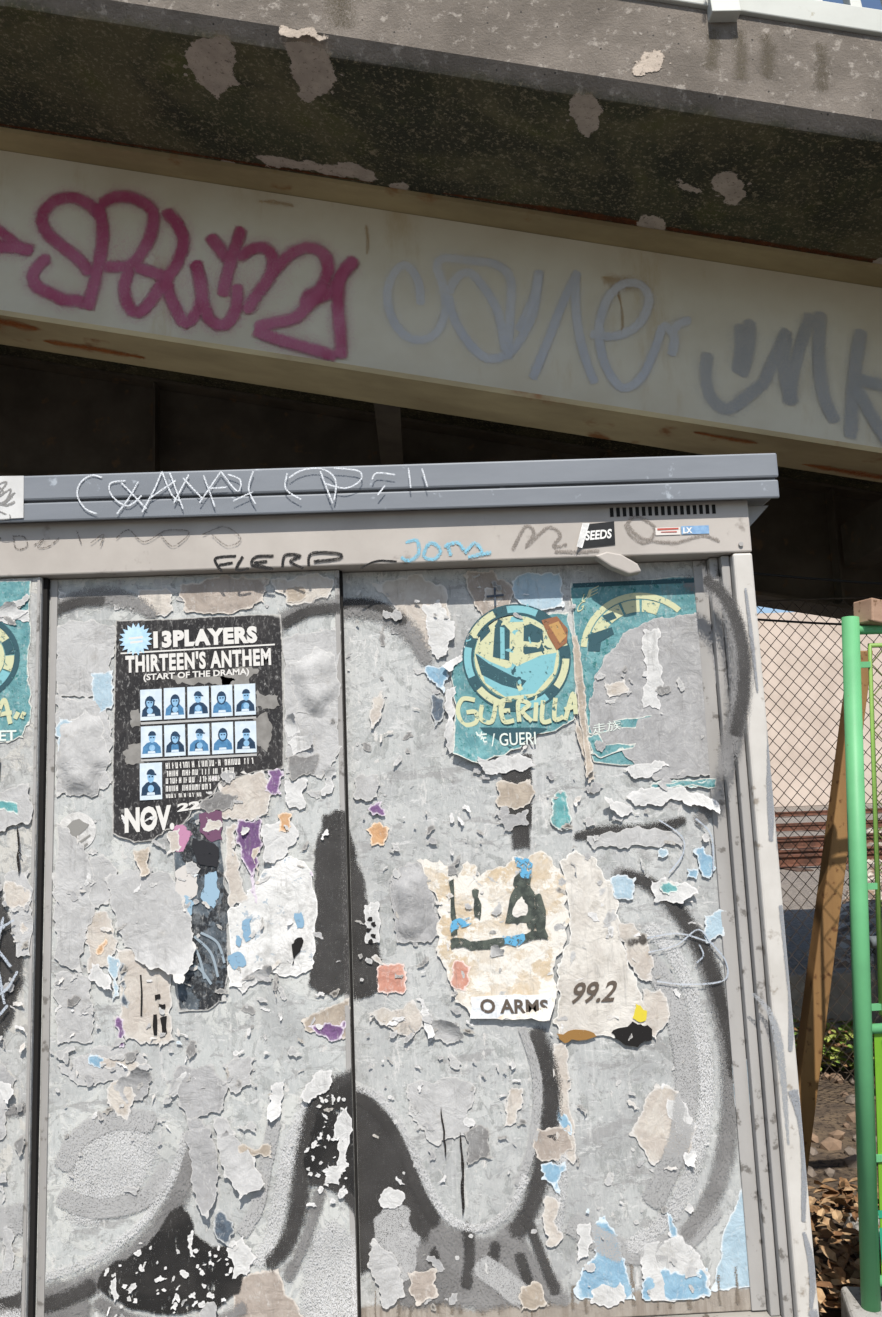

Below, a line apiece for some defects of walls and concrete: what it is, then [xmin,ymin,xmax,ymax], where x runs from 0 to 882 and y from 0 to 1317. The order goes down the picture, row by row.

spalling [183,36,241,100]
spalling [279,25,345,103]
spalling [632,49,671,76]
spalling [255,154,409,190]
spalling [676,171,752,206]
peeling [55,573,335,790]
peeling [357,574,465,754]
peeling [0,783,33,831]
peeling [192,627,413,938]
peeling [473,612,720,1041]
peeling [0,870,33,958]
peeling [49,773,750,1317]